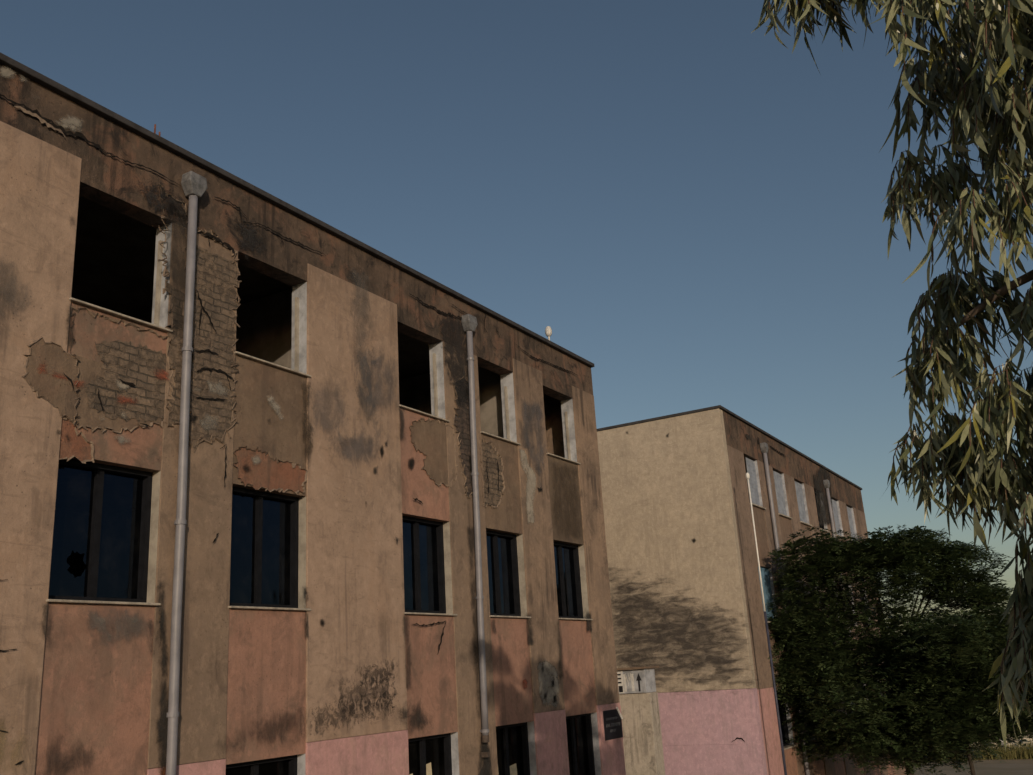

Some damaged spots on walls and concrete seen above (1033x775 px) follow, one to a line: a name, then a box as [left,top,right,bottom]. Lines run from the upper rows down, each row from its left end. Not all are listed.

crack [0,94,179,185]
crack [202,232,235,254]
crack [214,196,326,256]
spalling [22,183,308,495]
flaking render [408,376,505,508]
leakage [611,580,741,684]